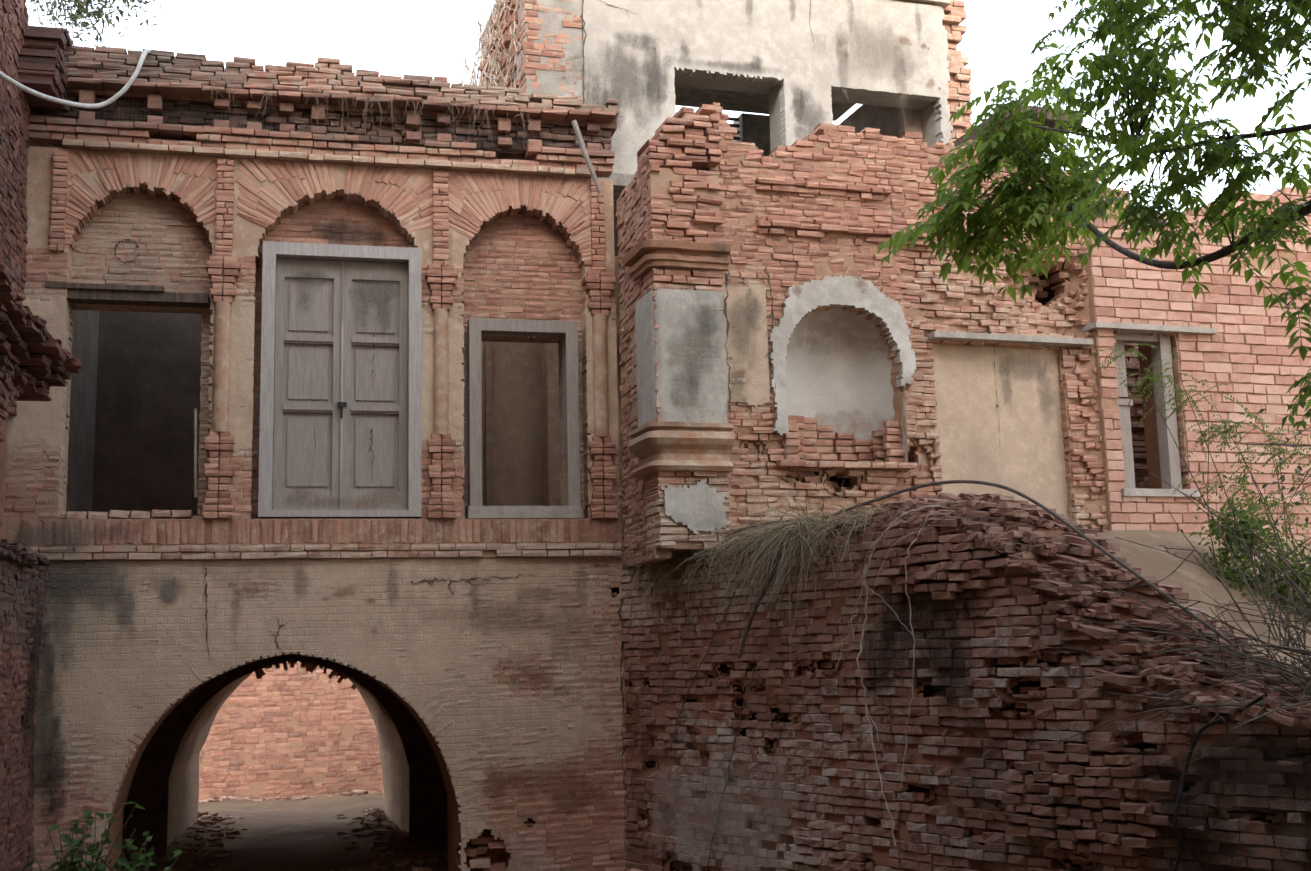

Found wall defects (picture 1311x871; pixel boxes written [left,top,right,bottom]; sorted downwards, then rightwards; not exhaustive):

water stain [603,36,660,105]
water stain [794,95,819,133]
spalling [1028,259,1078,313]
spalling [907,438,937,478]
spalling [783,468,863,498]
crack [411,574,536,598]
spalling [787,652,842,679]
spalling [913,680,945,697]
water stain [25,630,63,812]
spalling [705,661,797,755]
spalling [900,780,936,804]
spalling [662,854,722,871]